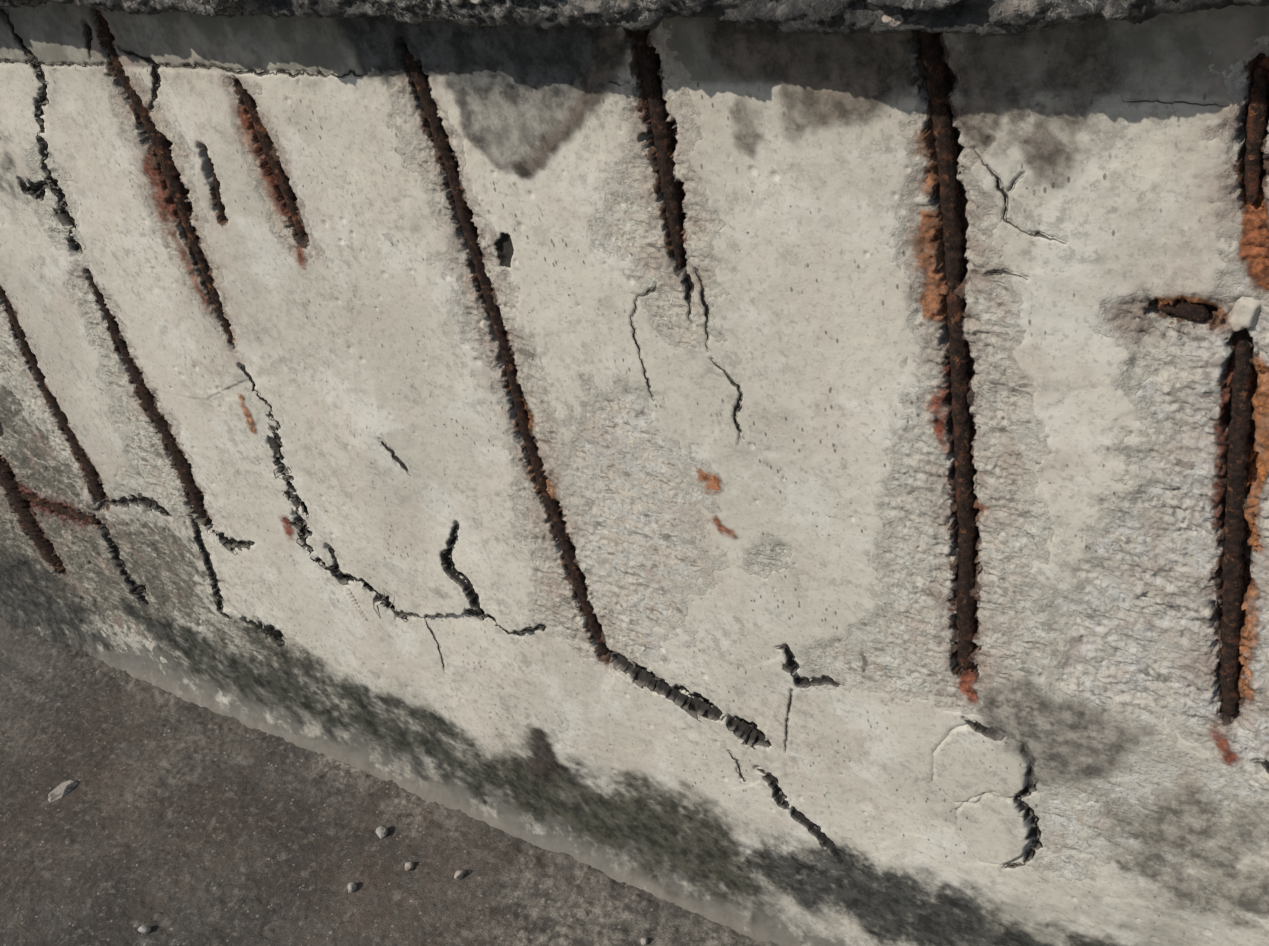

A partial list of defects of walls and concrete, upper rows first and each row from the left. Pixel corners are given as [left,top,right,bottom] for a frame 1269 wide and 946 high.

damp [339,15,624,176]
flaking render [882,14,905,27]
crack [630,249,742,445]
corrosion [913,208,948,322]
corrosion [1239,183,1269,291]
crack [239,366,544,671]
flaking render [795,30,1269,885]
corrosion [1211,356,1235,529]
corrosion [1238,359,1269,700]
damp [120,598,1048,946]
crack [964,719,1041,869]
damp [979,680,1150,783]